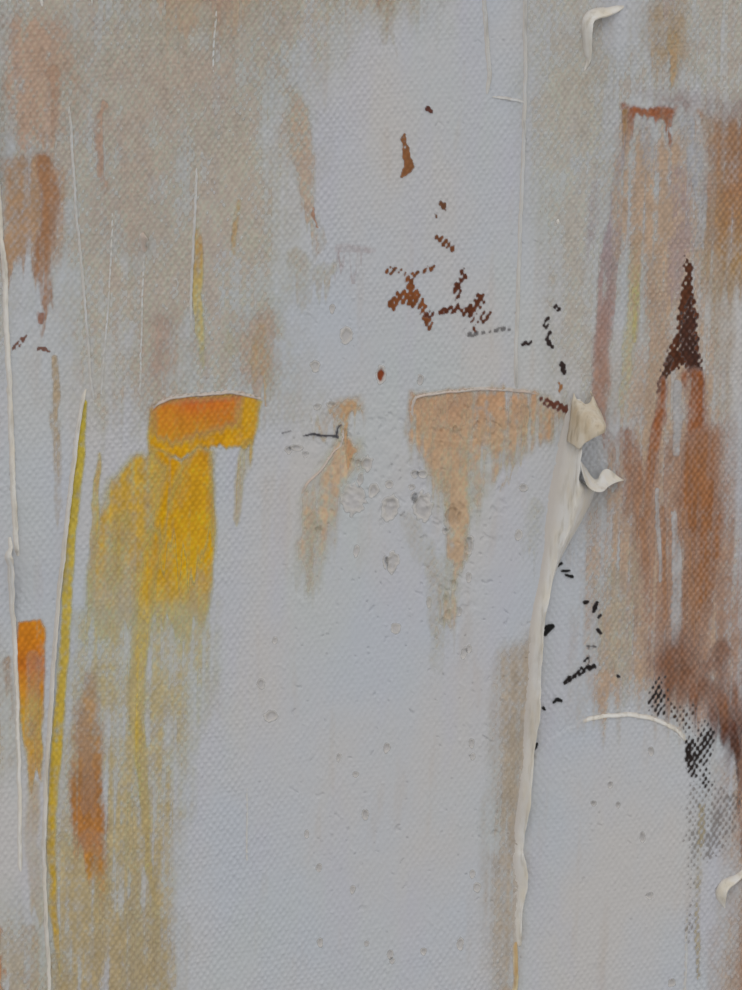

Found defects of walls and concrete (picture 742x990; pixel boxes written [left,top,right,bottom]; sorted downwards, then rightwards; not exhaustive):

peeling [581,5,624,71]
rust [622,104,675,152]
rust [623,118,742,781]
peeling [715,870,742,908]